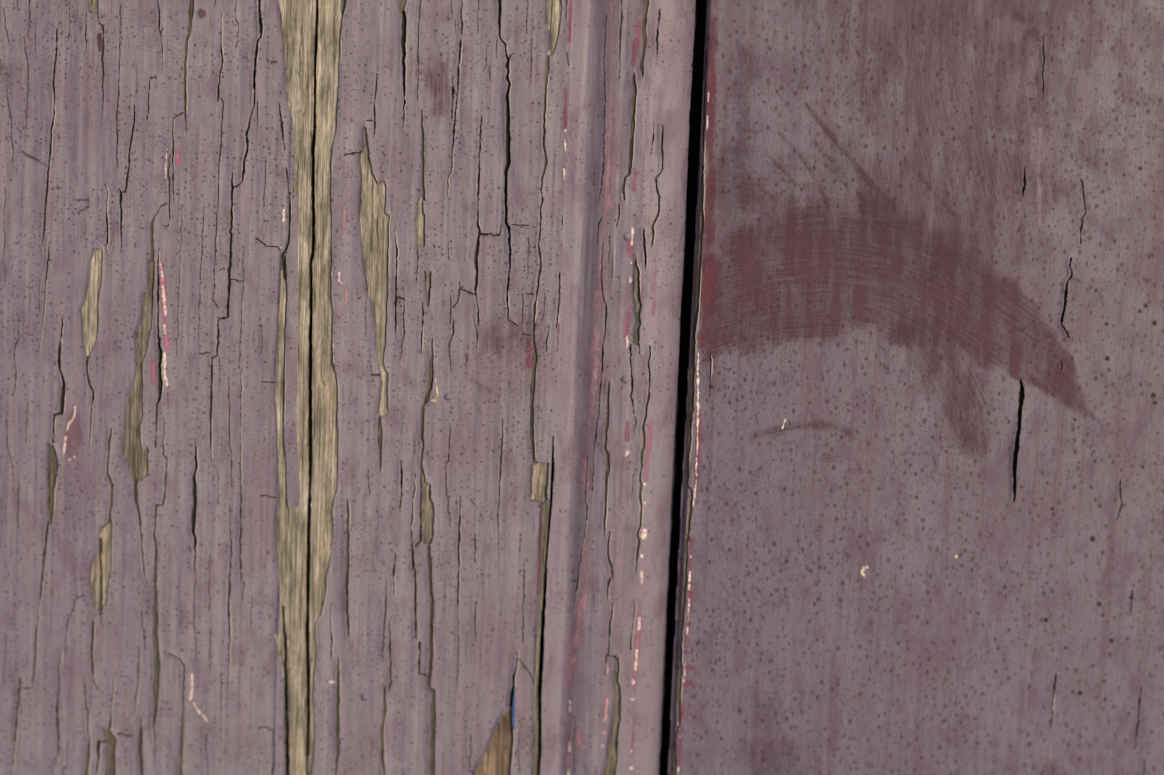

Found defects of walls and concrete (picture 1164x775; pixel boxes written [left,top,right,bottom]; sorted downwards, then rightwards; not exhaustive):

peeling [546,0,563,56]
peeling [82,248,104,359]
peeling [124,259,167,482]
crack [0,0,292,775]
peeling [275,0,346,775]
peeling [360,127,391,417]
crack [330,0,569,775]
crack [572,0,664,675]
crack [1012,378,1025,503]
peeling [474,706,515,775]
peeling [531,462,552,775]